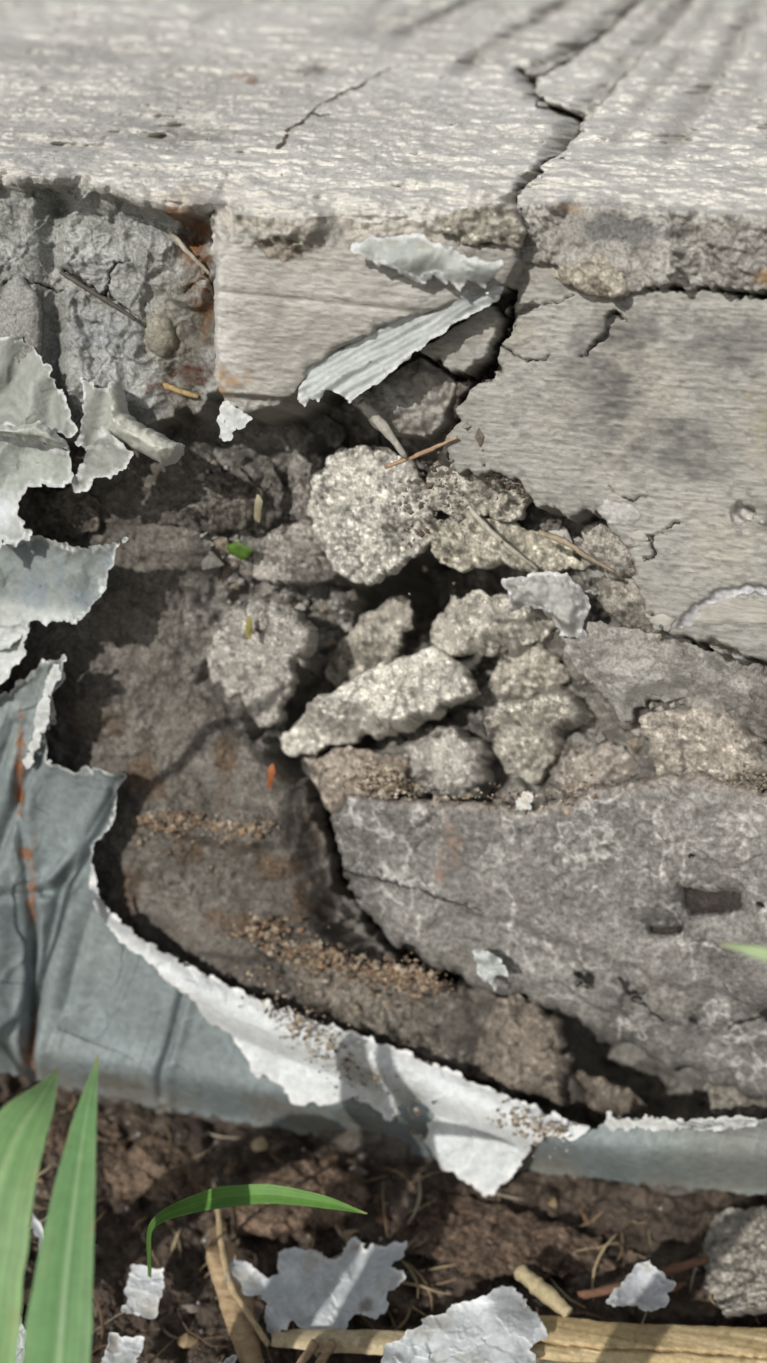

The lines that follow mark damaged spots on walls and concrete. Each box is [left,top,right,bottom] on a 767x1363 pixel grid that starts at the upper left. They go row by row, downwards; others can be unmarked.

crack [276,67,391,149]
crack [513,0,640,194]
crack [435,287,549,423]
crack [587,311,627,356]
spalling [594,492,649,547]
spalling [730,500,767,526]
spalling [650,584,767,632]